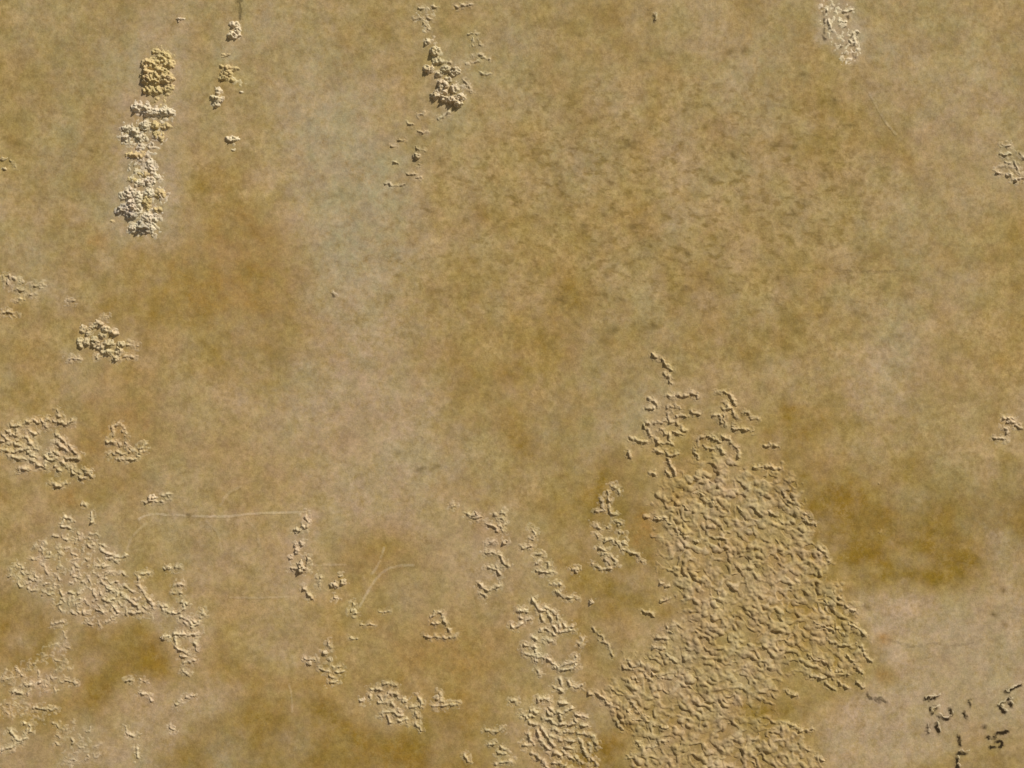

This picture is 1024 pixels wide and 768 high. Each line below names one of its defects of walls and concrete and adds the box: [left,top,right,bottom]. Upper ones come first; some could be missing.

flaking render [994,680,1024,716]
flaking render [922,692,1010,752]
flaking render [954,733,972,768]